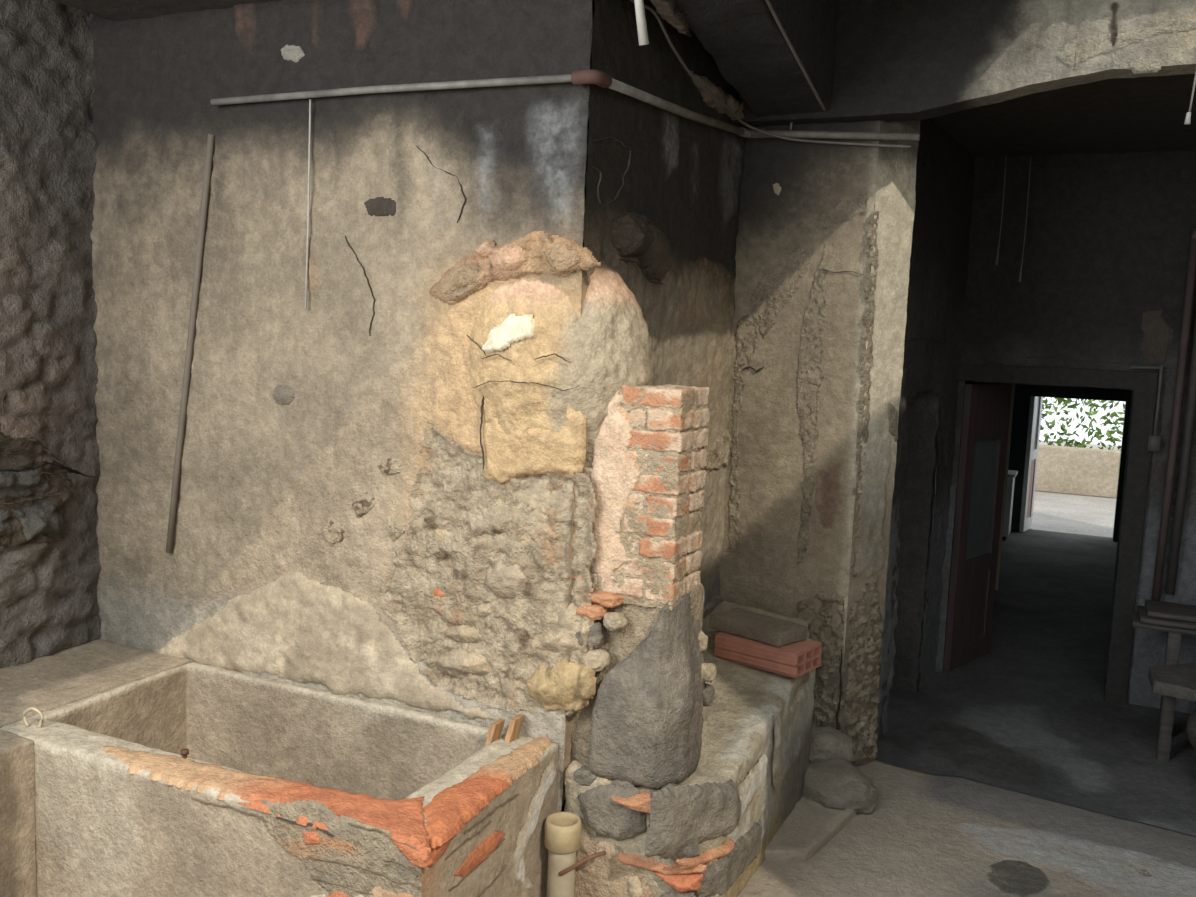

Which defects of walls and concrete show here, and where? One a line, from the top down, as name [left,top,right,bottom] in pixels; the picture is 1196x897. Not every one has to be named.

peeling [650,0,692,37]
peeling [688,71,744,121]
crack [415,145,466,223]
crack [592,136,631,206]
crack [345,236,375,336]
flaking render [0,432,72,549]
flaking render [377,396,597,716]
peeling [101,737,551,897]
damp [945,817,1196,897]